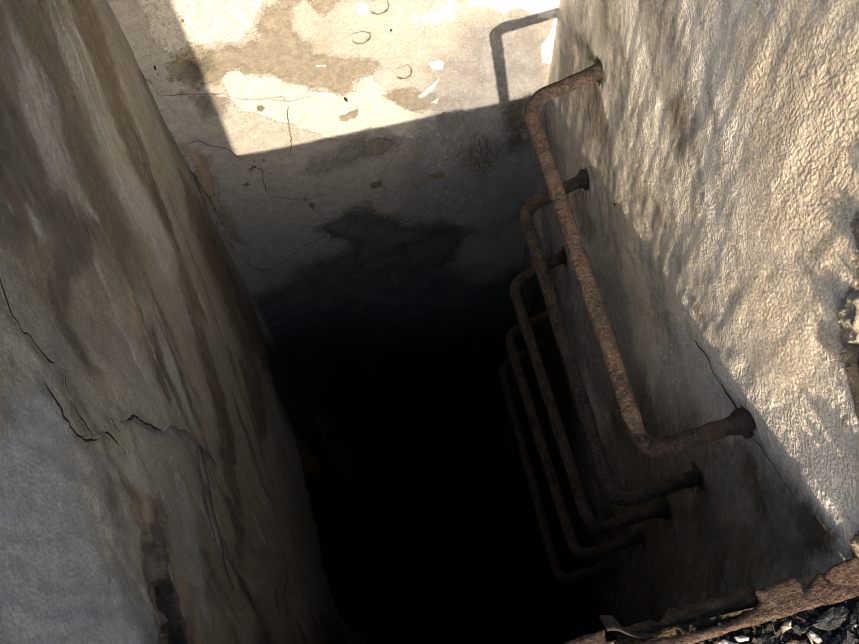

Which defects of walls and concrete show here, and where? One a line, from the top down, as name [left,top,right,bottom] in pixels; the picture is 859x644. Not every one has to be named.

peeling [107,0,465,273]
peeling [467,0,560,64]
corrosion [582,81,610,147]
leakage [0,0,273,644]
leakage [180,0,834,644]
spalling [836,207,859,423]
crack [0,276,235,591]
spalling [140,524,189,644]
spalling [849,531,859,558]